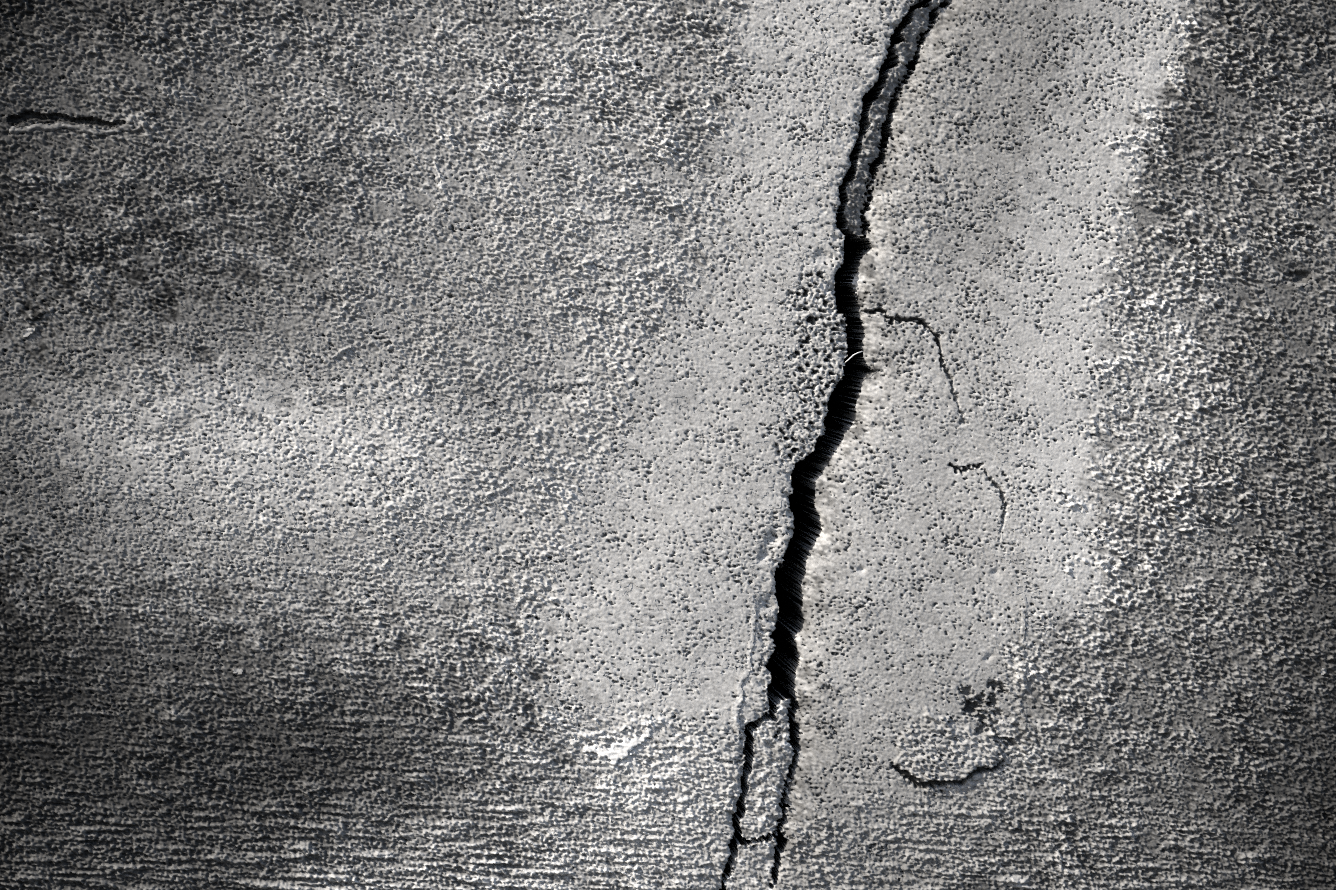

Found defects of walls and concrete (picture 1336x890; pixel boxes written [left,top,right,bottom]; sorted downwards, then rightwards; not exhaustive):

crack [719,0,966,890]
crack [948,461,1008,550]